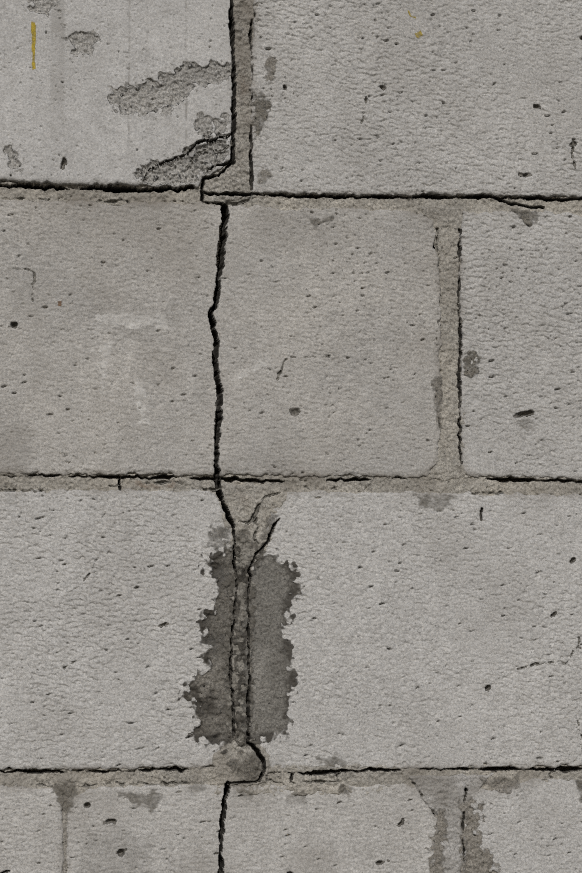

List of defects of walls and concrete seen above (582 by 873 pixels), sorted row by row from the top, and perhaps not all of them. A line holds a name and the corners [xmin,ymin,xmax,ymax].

spalling [27,0,101,60]
spalling [107,59,237,121]
spalling [133,111,231,191]
crack [0,182,67,192]
crack [74,184,194,203]
crack [143,0,582,873]
crack [0,474,179,493]
water stain [177,534,305,754]